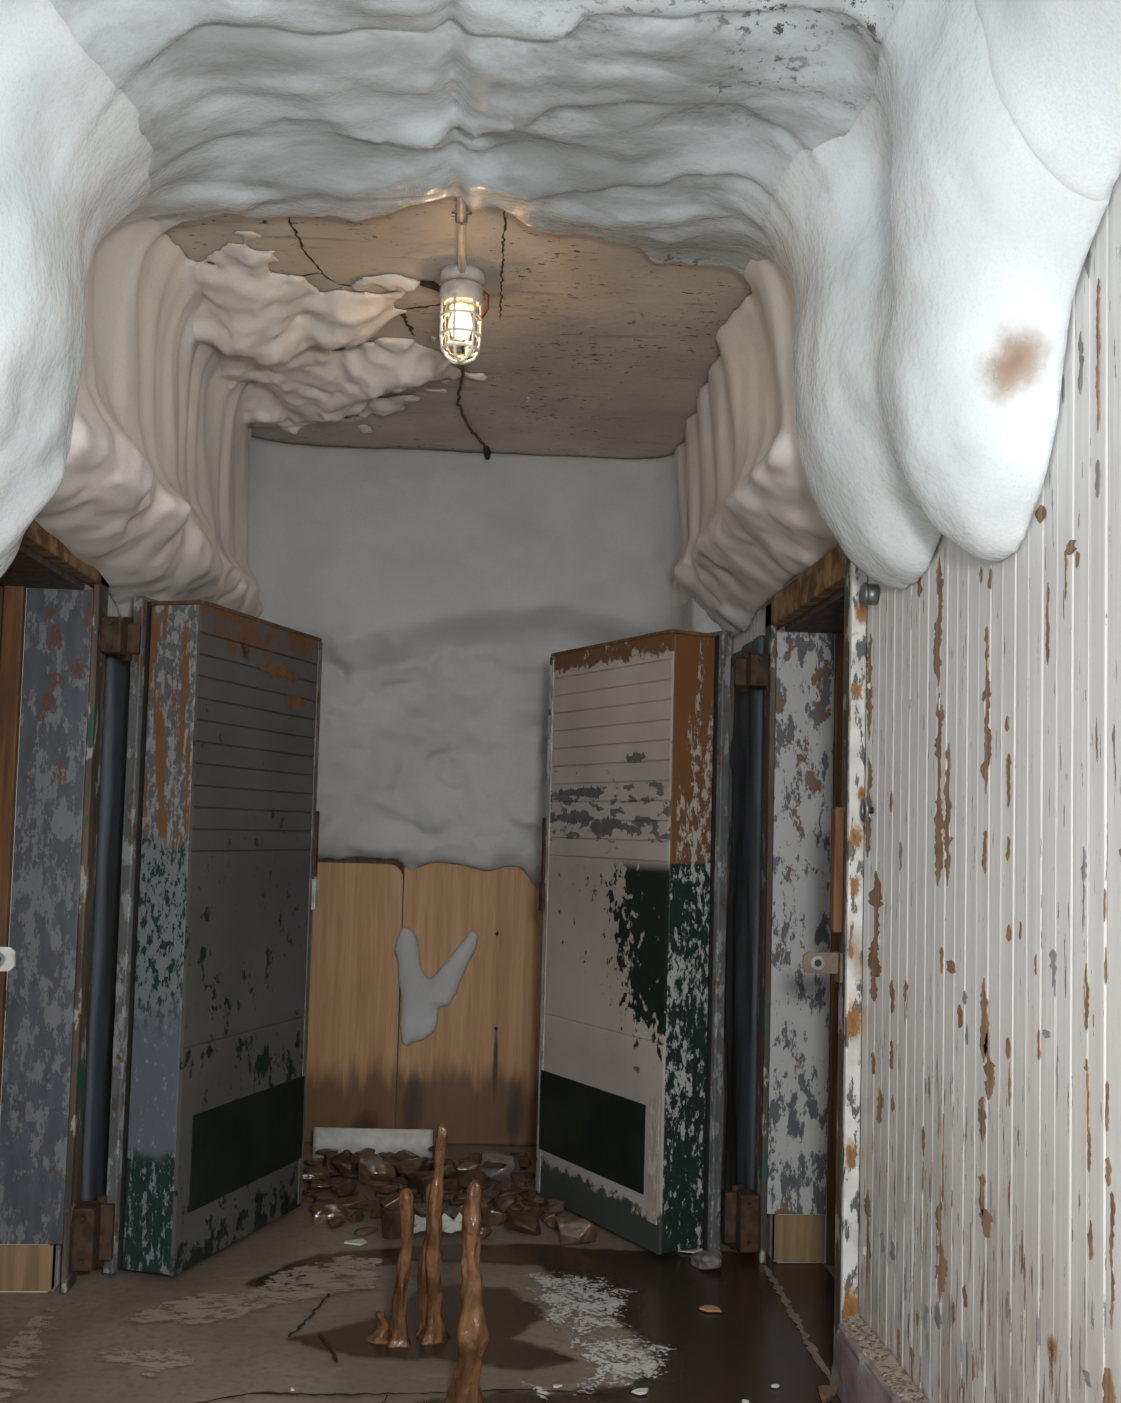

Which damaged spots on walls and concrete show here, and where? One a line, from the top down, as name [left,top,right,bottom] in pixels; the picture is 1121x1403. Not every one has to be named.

crack [288,217,352,286]
crack [395,304,444,336]
crack [499,211,507,317]
peeling [917,557,954,886]
peeling [980,626,1012,808]
peeling [865,758,909,1013]
peeling [957,978,1011,1143]
crack [195,1293,448,1403]
leakage [246,1246,422,1291]
leakage [290,1284,462,1361]
leakage [480,1243,842,1403]
peeling [1084,1059,1116,1329]